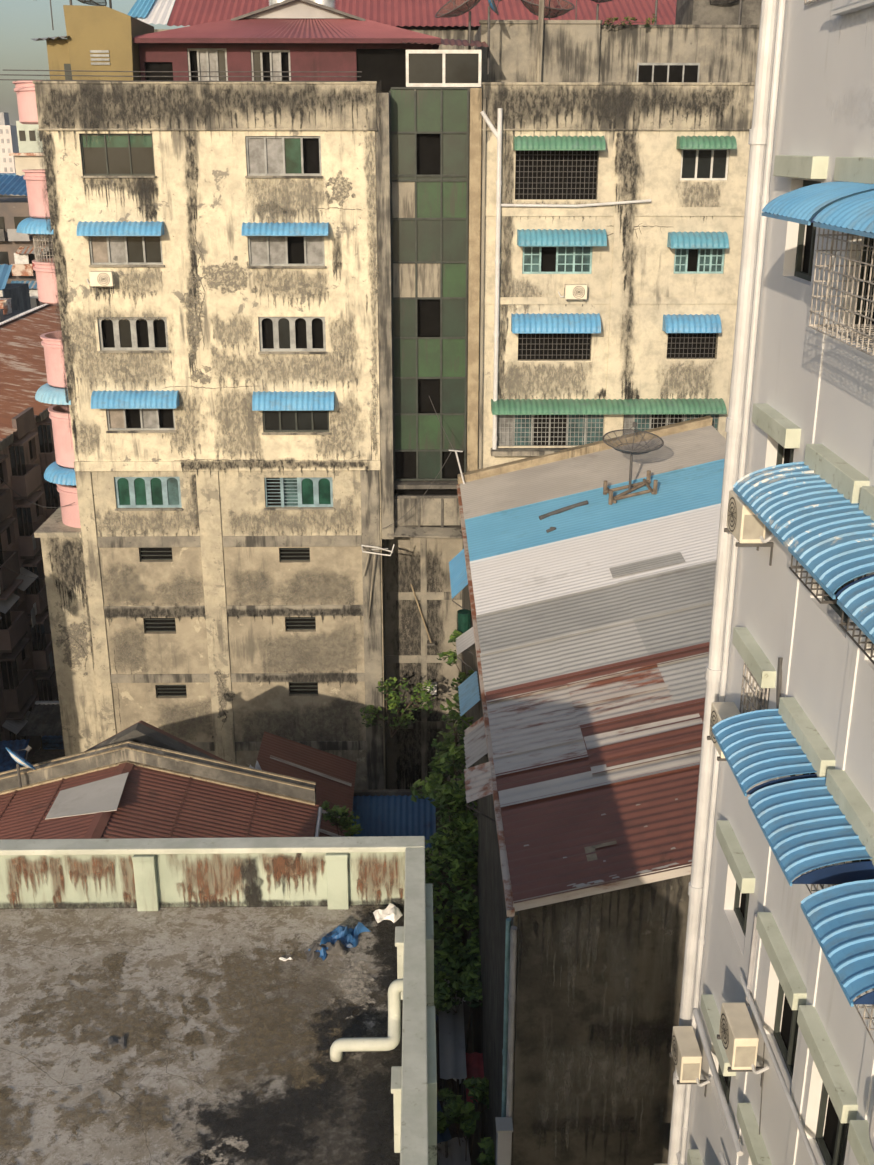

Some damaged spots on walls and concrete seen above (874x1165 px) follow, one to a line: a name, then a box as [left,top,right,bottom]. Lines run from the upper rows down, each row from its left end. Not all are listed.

water stain [37,84,383,536]
water stain [486,86,735,400]
water stain [48,539,94,669]
water stain [104,566,206,674]
water stain [227,573,361,742]
corrosion [8,856,137,909]
corrosion [180,855,325,907]
corrosion [348,857,403,905]
water stain [172,899,404,1165]
water stain [516,876,683,1164]